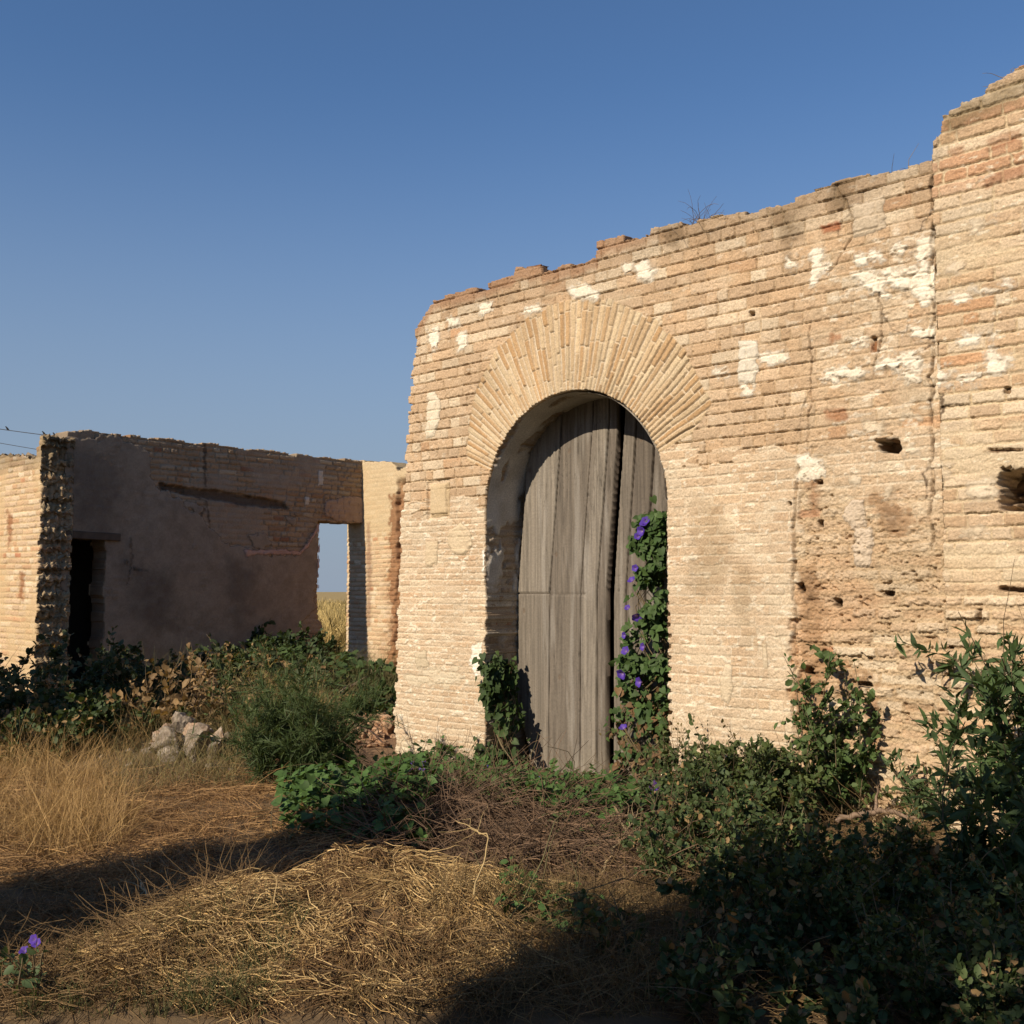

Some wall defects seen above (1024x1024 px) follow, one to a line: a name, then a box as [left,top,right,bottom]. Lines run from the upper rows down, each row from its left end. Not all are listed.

crack [921,213,953,538]
peeling [862,418,885,436]
peeling [795,453,826,482]
peeling [324,496,363,523]
peeling [65,433,319,667]
peeling [852,527,874,567]
spalling [469,642,482,676]